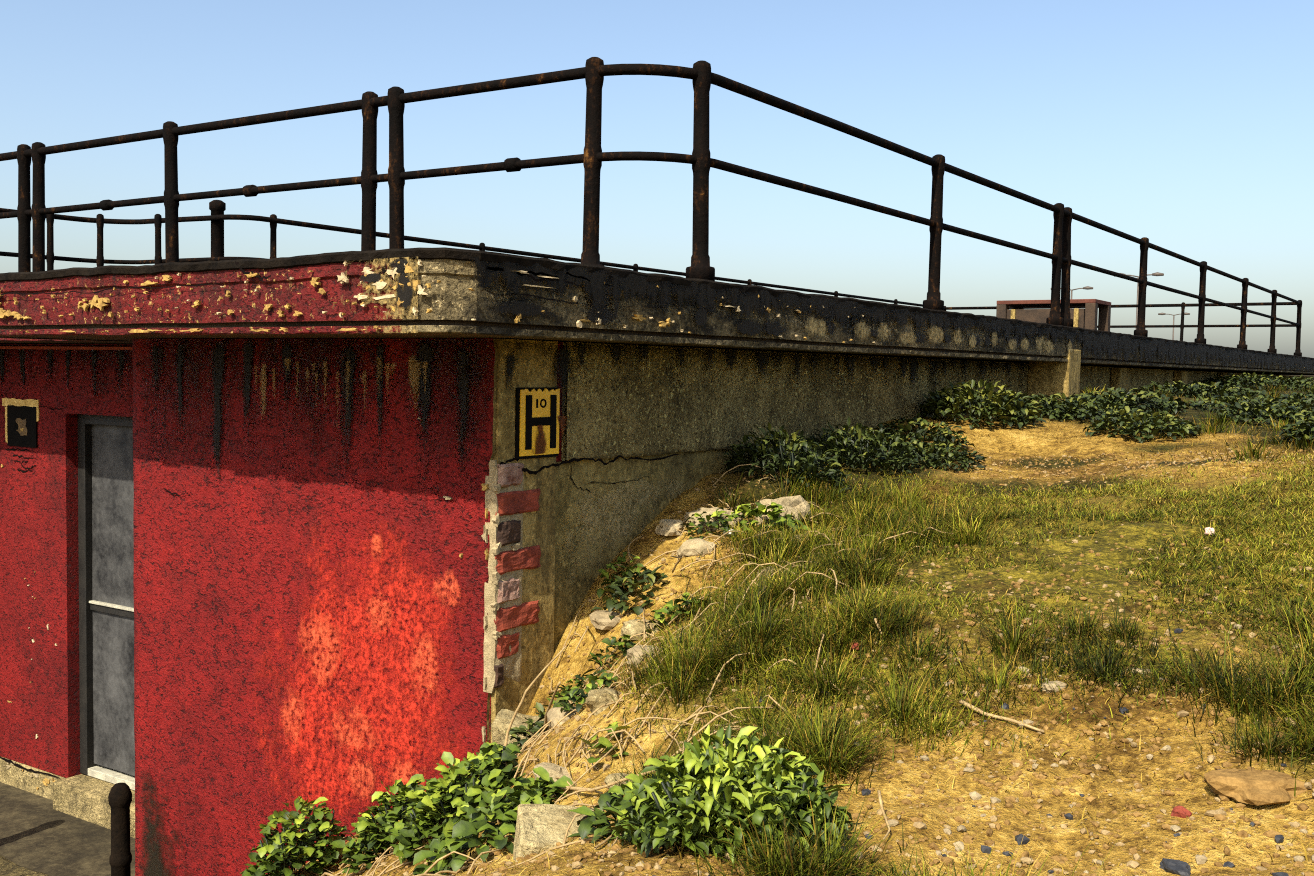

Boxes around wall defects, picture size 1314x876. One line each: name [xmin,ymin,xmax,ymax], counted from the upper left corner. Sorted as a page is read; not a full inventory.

peeling [0,273,203,333]
peeling [217,256,441,333]
peeling [623,312,691,334]
water stain [474,256,1314,389]
water stain [152,339,394,472]
water stain [410,339,487,459]
water stain [554,343,649,415]
crack [498,454,680,493]
flaking render [481,460,541,693]